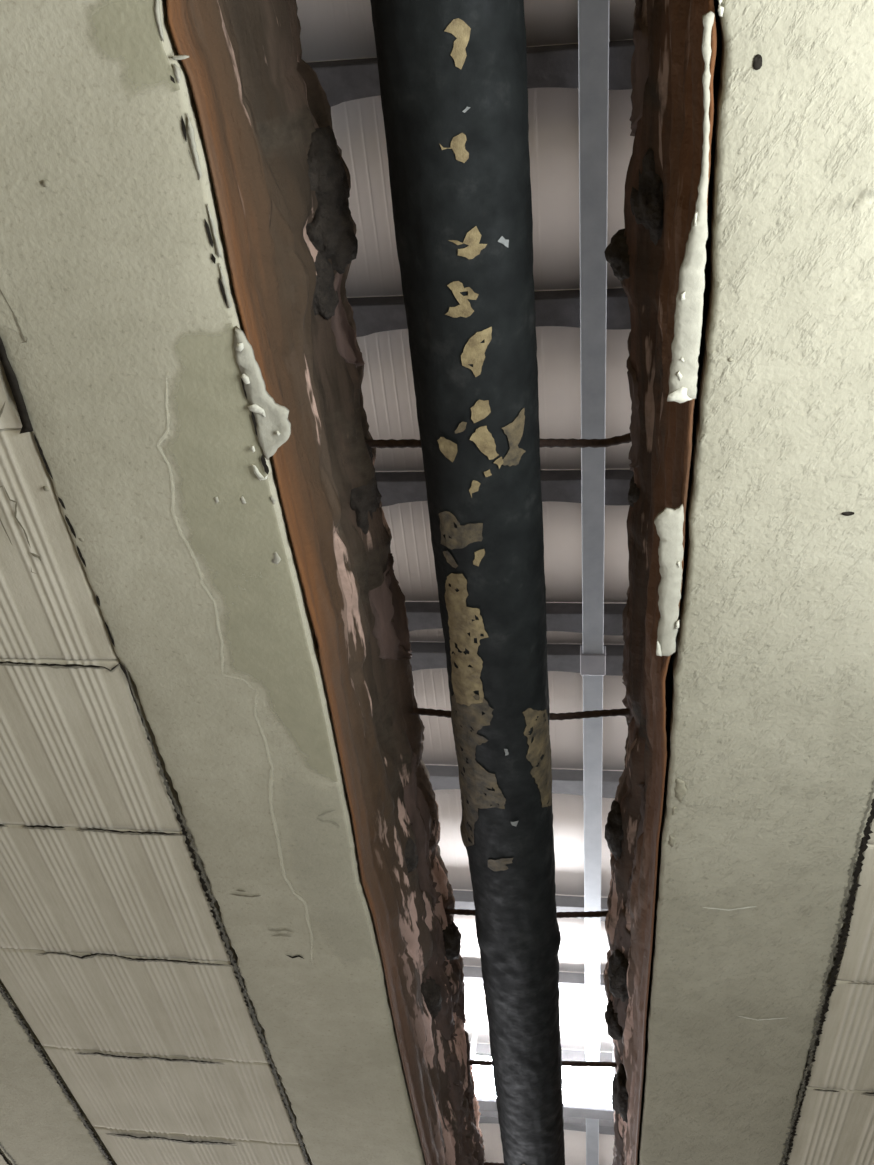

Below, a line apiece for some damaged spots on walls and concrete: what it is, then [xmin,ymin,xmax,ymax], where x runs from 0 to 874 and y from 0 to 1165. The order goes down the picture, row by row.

leakage [91,0,180,91]
peeling [667,0,724,403]
peeling [234,326,291,481]
leakage [157,323,338,966]